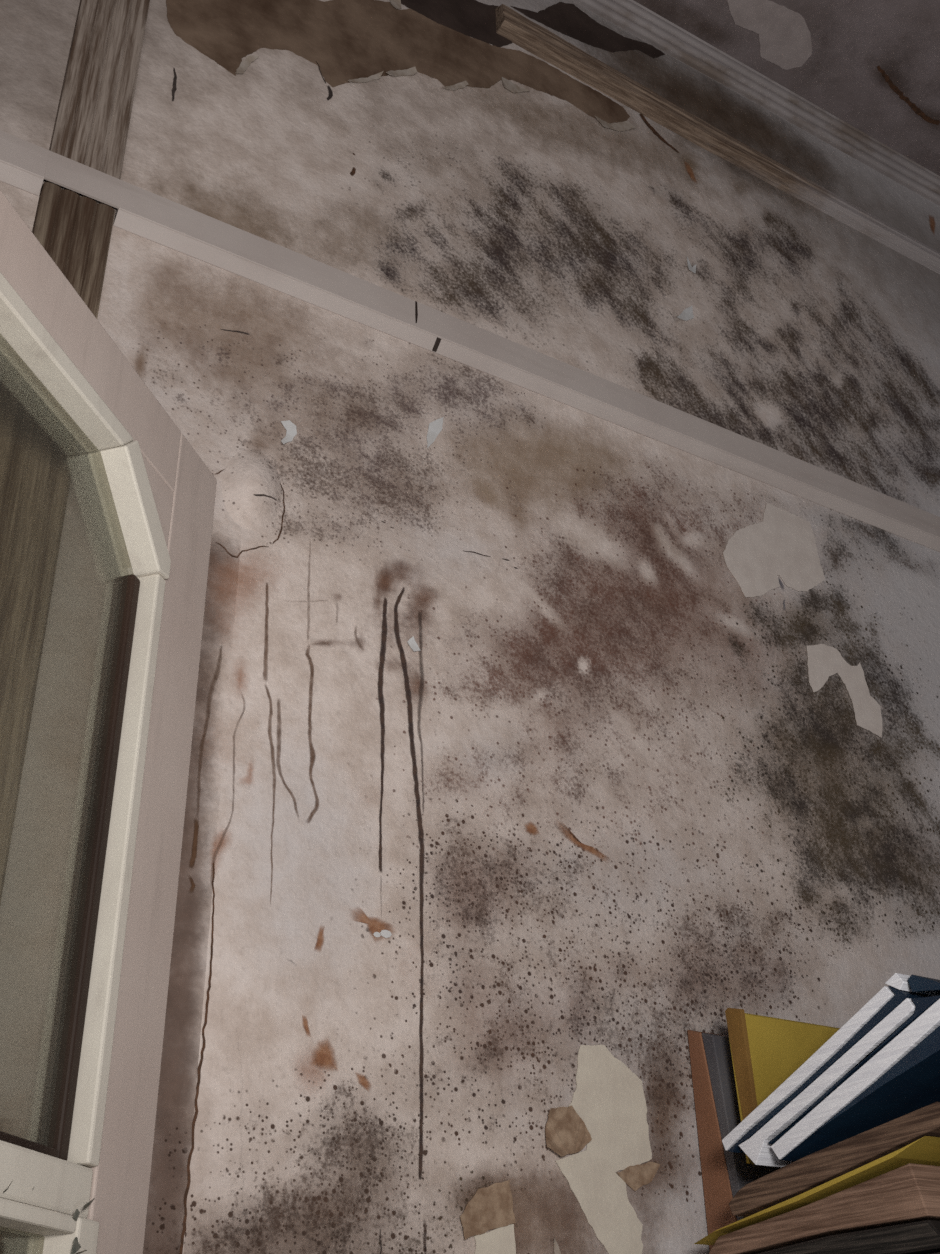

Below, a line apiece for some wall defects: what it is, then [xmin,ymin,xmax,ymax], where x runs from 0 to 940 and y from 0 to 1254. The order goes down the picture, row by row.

peeling [166,0,665,131]
peeling [727,0,812,70]
damp [381,158,940,499]
crack [217,483,285,558]
peeling [723,503,825,597]
peeling [807,644,883,738]
damp [143,353,940,1254]
crack [179,863,215,1254]
peeling [545,1045,660,1254]
peeling [460,1180,516,1254]